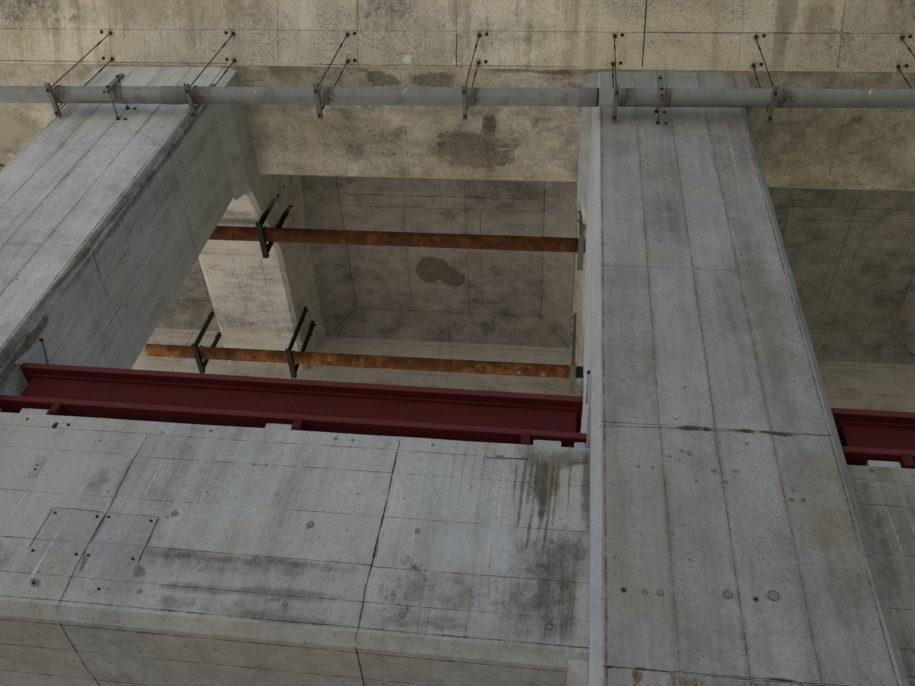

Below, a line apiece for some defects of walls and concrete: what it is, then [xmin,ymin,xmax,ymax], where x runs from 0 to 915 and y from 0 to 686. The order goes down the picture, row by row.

crack [57,435,148,686]
crack [355,440,400,686]
leakage [484,455,590,516]